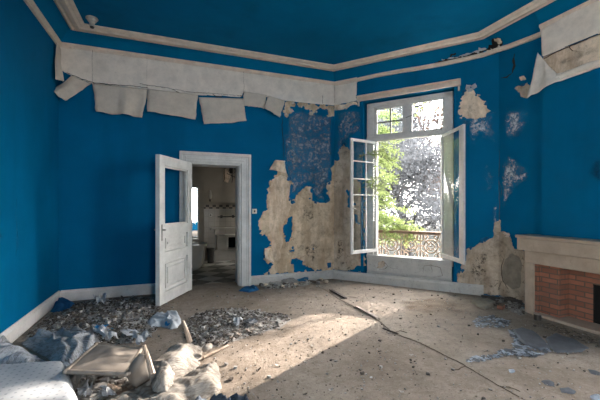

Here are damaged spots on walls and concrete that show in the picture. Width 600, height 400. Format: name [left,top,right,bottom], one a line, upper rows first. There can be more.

spalling [441,38,503,60]
flaking render [543,35,600,73]
spalling [458,84,490,133]
spalling [515,76,532,98]
flaking render [258,101,366,275]
flaking render [457,220,525,304]
crack [378,320,525,400]